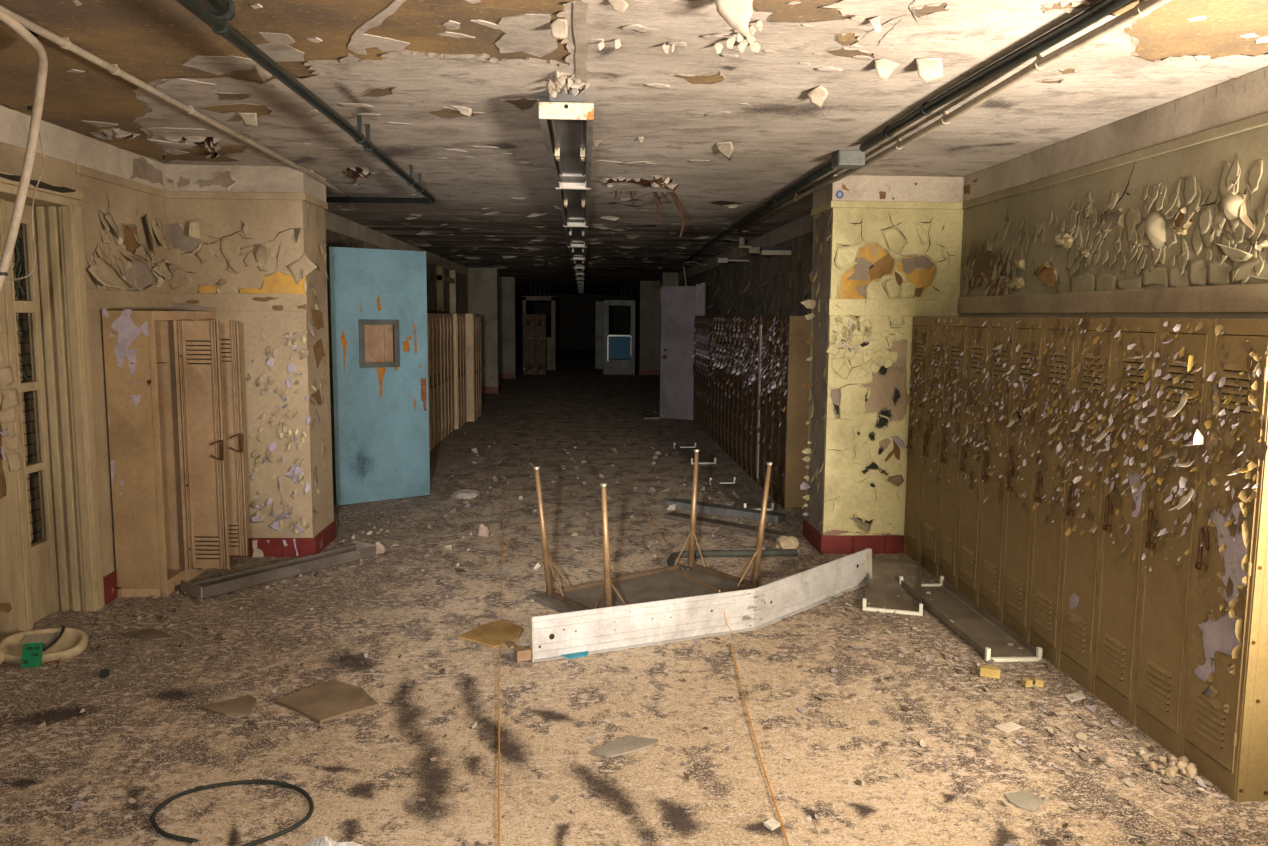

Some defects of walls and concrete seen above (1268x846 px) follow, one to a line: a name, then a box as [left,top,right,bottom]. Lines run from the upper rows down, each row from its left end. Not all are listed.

peeling [0,0,900,193]
peeling [916,58,943,83]
peeling [912,2,950,18]
peeling [1041,0,1101,15]
peeling [1108,0,1268,62]
spalling [586,140,809,270]
crack [834,189,965,292]
peeling [961,154,1268,296]
peeling [87,203,330,557]
peeling [376,321,421,398]
peeling [694,316,788,457]
peeling [800,208,1268,710]